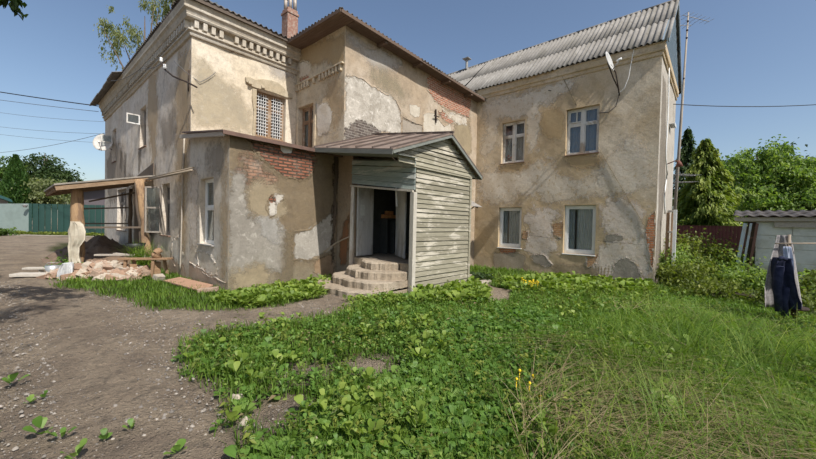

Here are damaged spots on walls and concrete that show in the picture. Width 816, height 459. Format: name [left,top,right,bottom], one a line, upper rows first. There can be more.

flaking render [344,73,403,139]
flaking render [422,75,472,132]
flaking render [168,60,336,290]
flaking render [551,221,563,240]
flaking render [644,209,656,270]